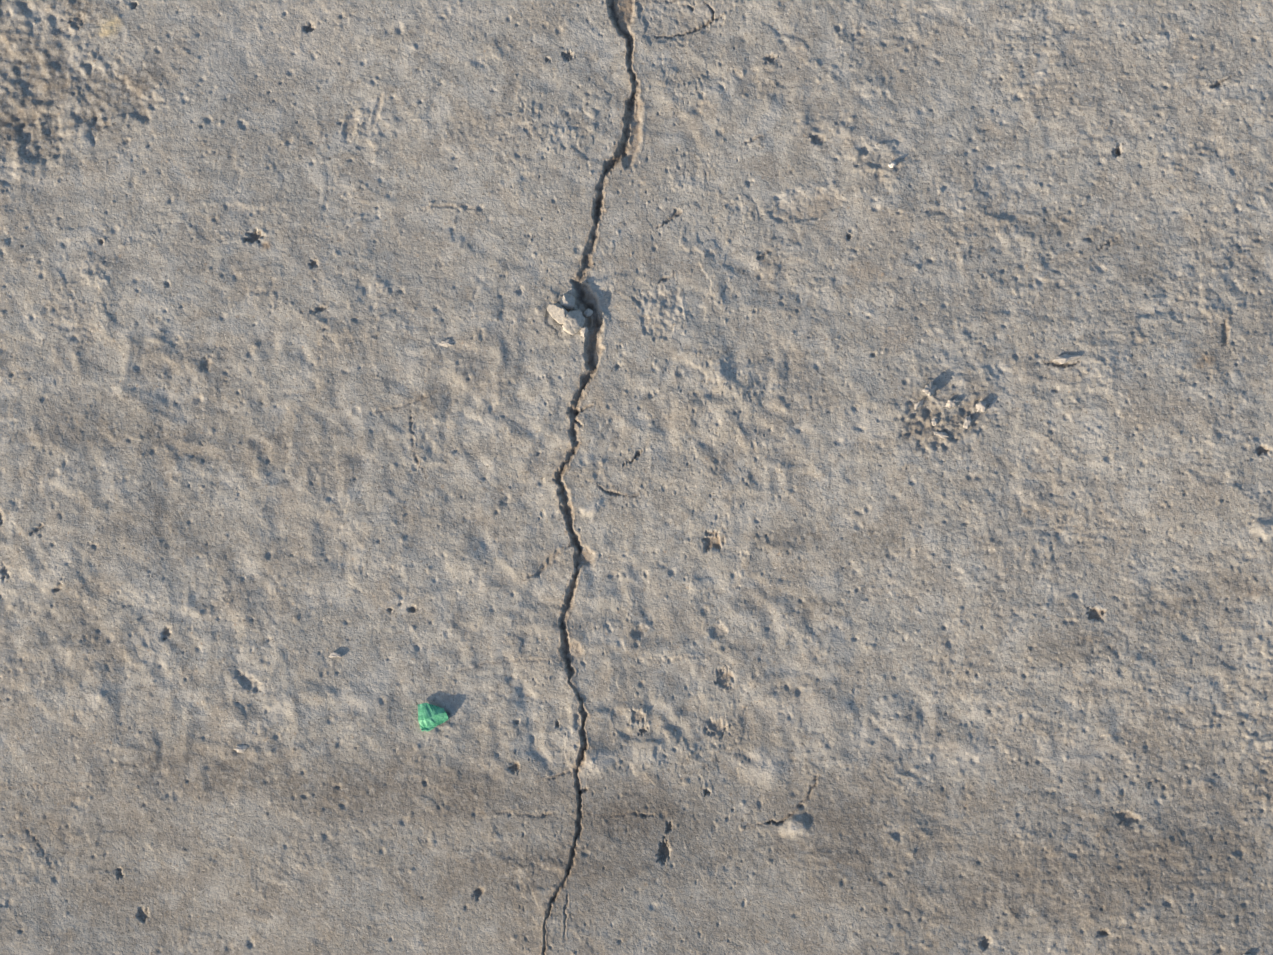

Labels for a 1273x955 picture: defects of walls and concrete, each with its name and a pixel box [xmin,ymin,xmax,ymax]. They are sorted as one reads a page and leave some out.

crack [455,0,726,955]